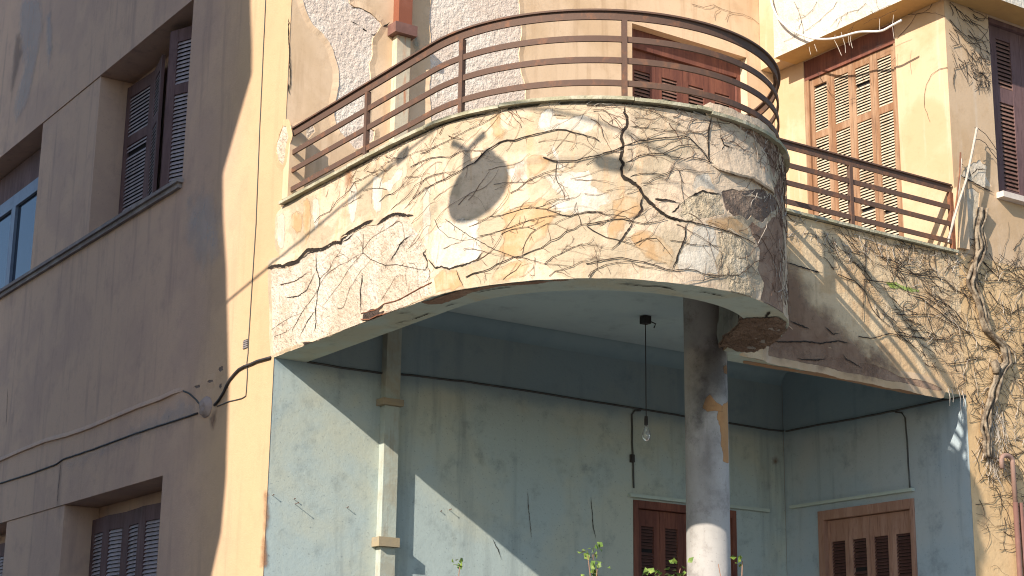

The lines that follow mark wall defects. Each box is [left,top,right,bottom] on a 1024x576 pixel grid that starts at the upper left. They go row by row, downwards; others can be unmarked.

spalling [268,0,946,398]
crack [612,107,723,297]
crack [267,204,515,337]
leakage [772,266,886,373]
peeling [703,395,729,463]